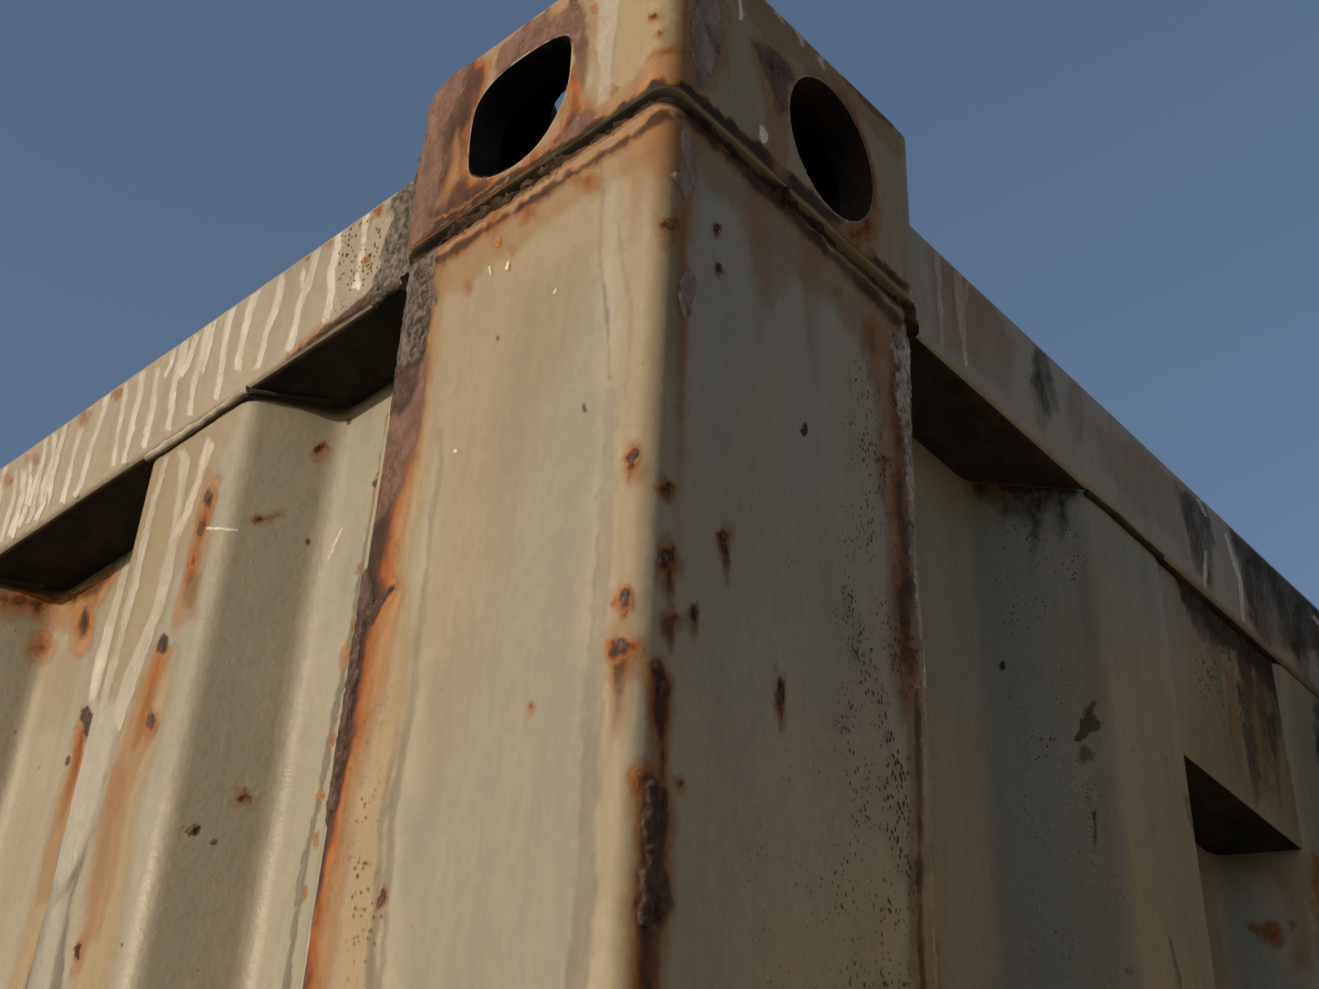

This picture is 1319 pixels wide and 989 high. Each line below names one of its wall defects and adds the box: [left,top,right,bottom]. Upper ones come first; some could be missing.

rust [0,570,115,664]
rust [72,469,220,989]
rust [236,787,250,803]
rust [283,0,910,989]